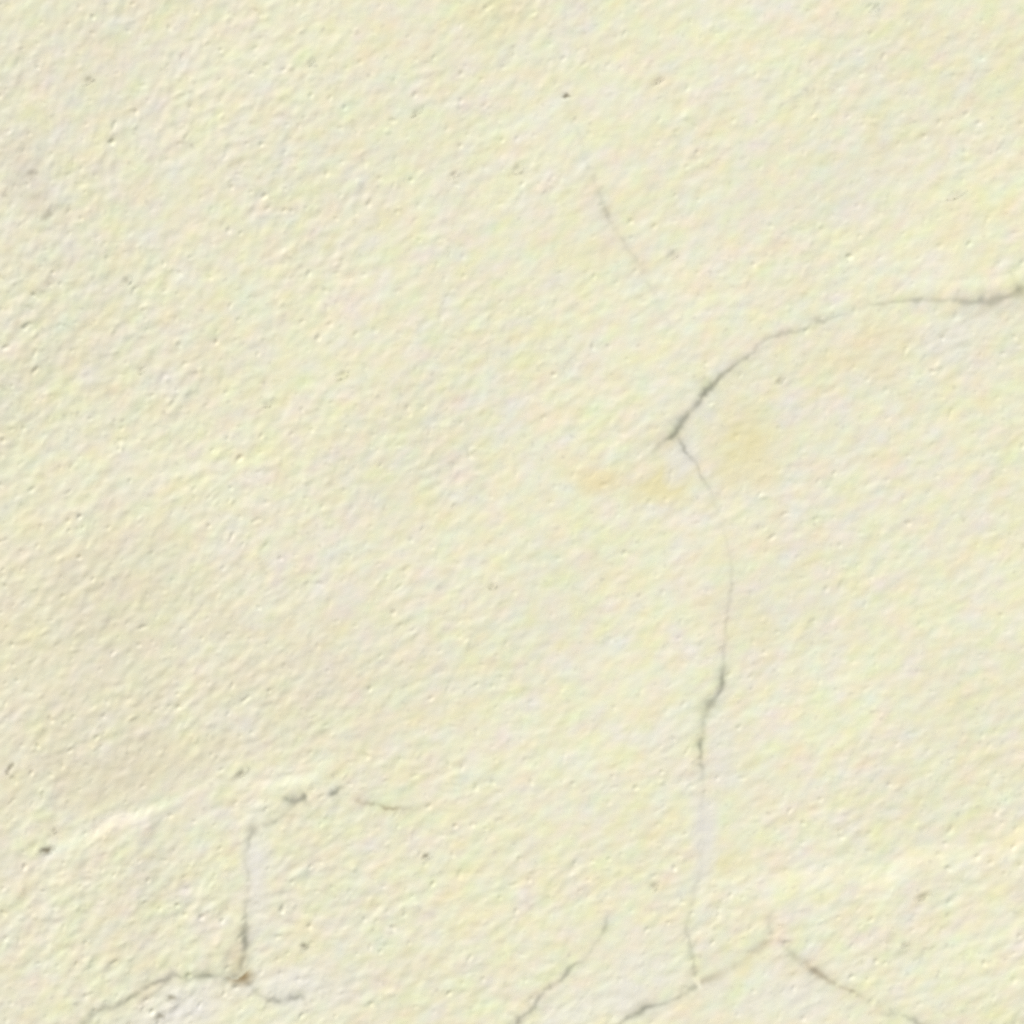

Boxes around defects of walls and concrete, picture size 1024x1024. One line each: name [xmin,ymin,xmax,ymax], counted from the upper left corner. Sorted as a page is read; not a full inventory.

crack [524,50,692,361]
crack [601,266,1024,1024]
crack [65,778,424,1024]